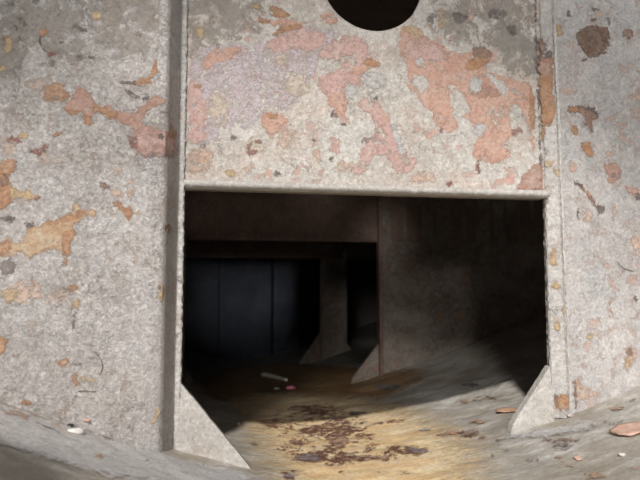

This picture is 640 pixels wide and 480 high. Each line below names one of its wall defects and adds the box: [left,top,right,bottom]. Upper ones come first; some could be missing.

peeling [62,85,178,163]
peeling [186,12,437,185]
peeling [397,25,536,164]
peeling [516,163,544,190]
rust [537,37,556,140]
rust [200,363,485,480]